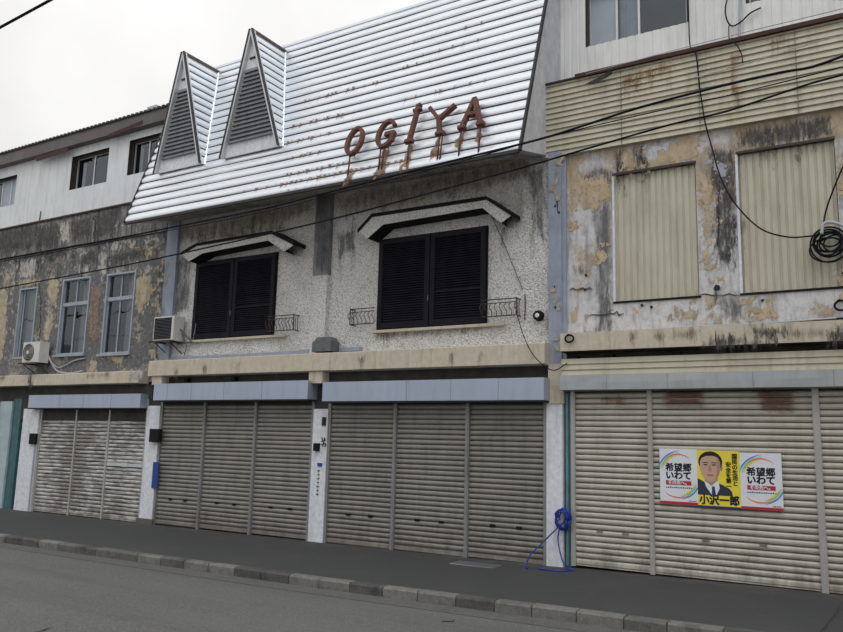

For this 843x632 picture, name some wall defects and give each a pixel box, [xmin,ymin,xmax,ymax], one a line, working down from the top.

damp [736,117,832,161]
damp [0,208,147,286]
damp [160,154,547,267]
peeling [547,133,730,325]
damp [709,149,745,265]
peeling [0,256,61,362]
peeling [74,241,121,344]
peeling [135,260,169,315]
damp [703,326,788,351]
rust [667,392,701,405]
rust [758,391,793,410]